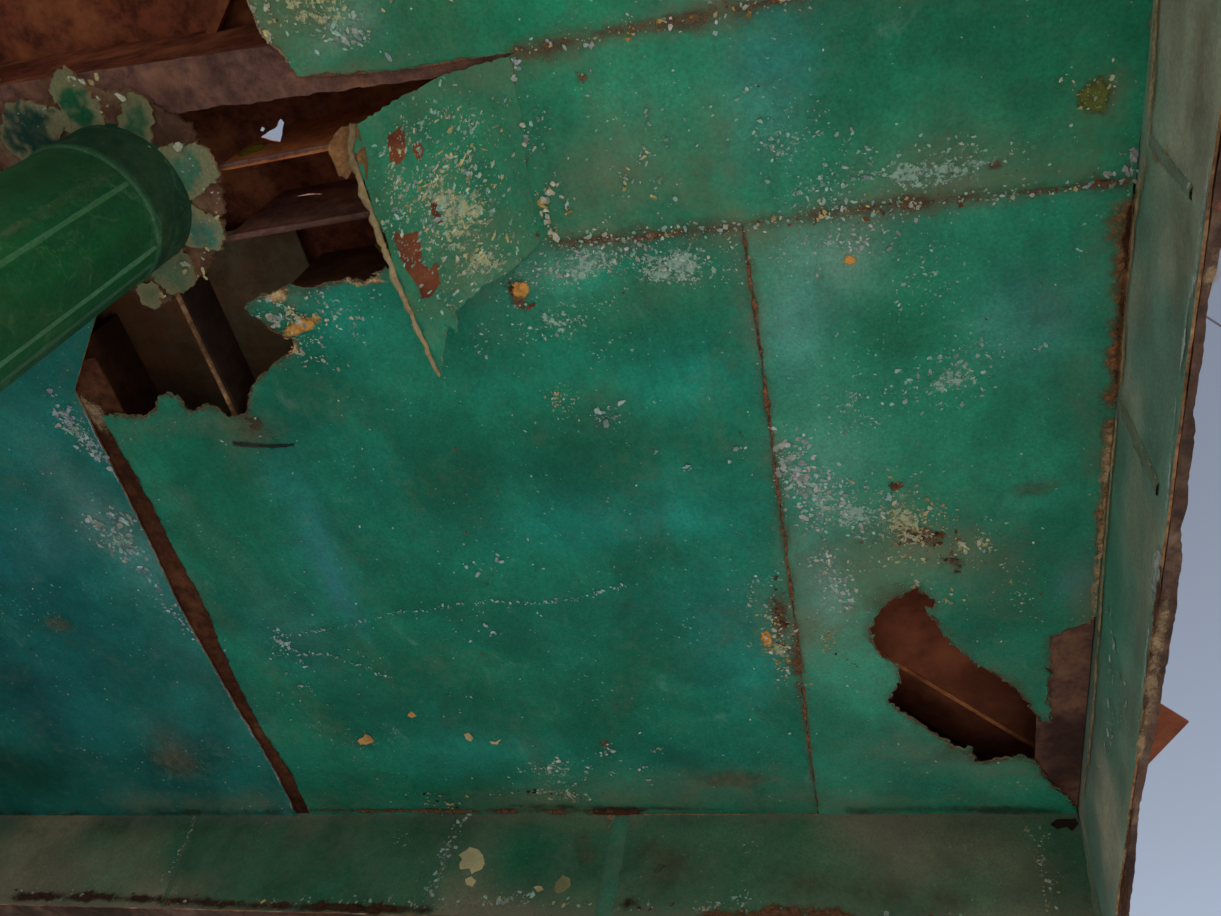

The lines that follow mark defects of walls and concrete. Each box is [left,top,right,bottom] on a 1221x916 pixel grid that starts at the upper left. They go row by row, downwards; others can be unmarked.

peeling [66,73,126,113]
corrosion [387,125,424,165]
peeling [174,247,209,280]
corrosion [231,316,318,418]
peeling [252,286,385,372]
corrosion [859,153,1163,806]
corrosion [79,393,752,824]
corrosion [1136,566,1169,759]
corrosion [12,890,432,916]
peeling [326,793,592,911]
peeling [693,889,782,914]
corrosion [1121,808,1134,916]